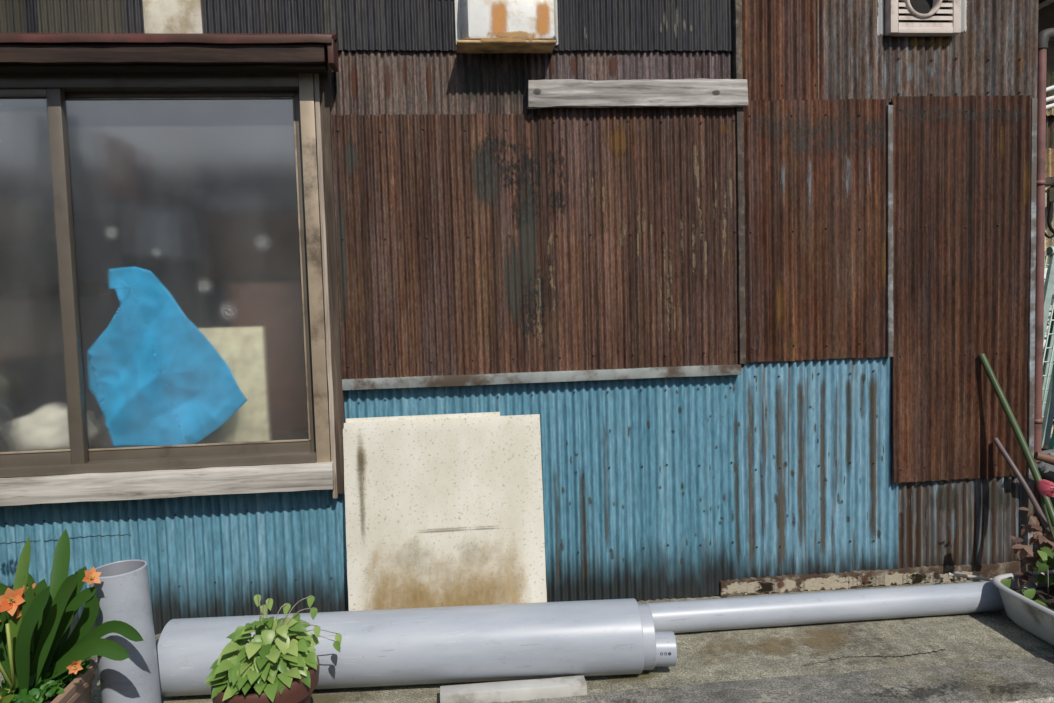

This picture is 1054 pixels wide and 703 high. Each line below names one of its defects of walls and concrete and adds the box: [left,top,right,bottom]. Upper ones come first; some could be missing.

corrosion [481,3,549,42]
leakage [504,65,526,99]
leakage [473,128,566,346]
spalling [721,570,981,595]